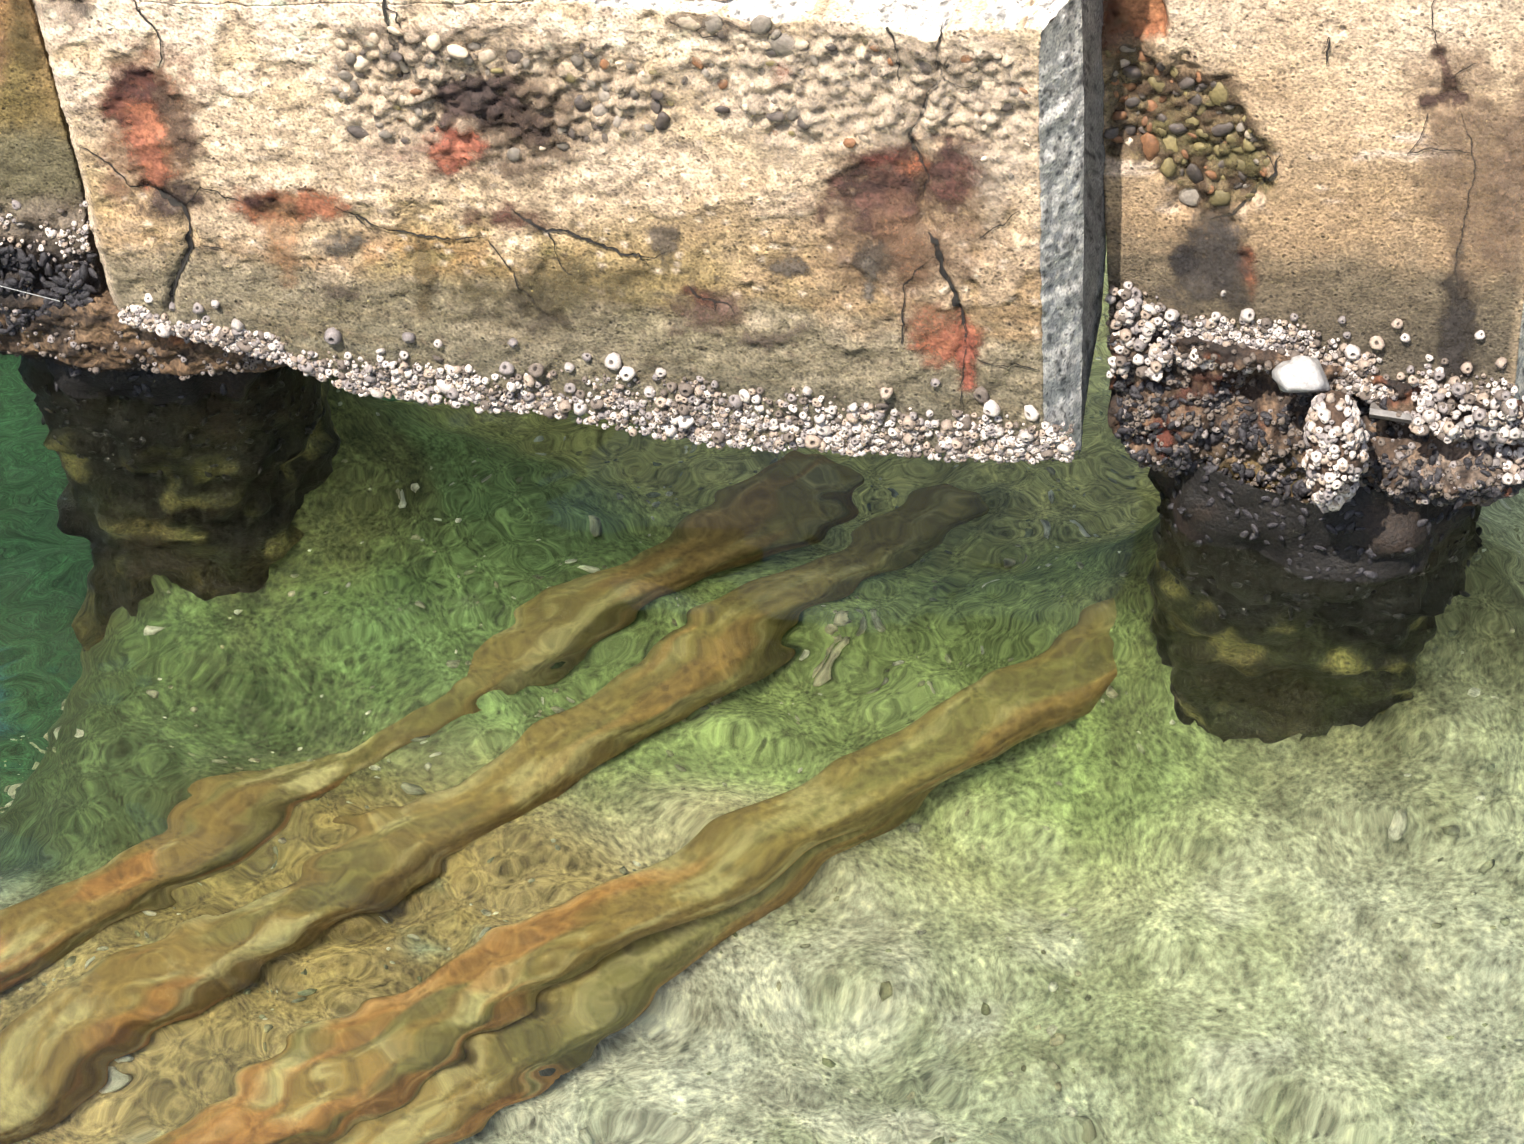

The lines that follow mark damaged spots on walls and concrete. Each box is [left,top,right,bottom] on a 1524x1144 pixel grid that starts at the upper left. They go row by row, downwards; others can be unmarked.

rust [1101,0,1169,66]
rust [99,49,203,220]
rust [387,74,578,178]
spalling [1103,44,1276,211]
crack [80,147,241,312]
crack [336,207,548,315]
crack [509,206,665,275]
crack [687,284,735,314]
rust [817,132,987,290]
rust [908,304,982,390]
crack [885,20,1040,403]